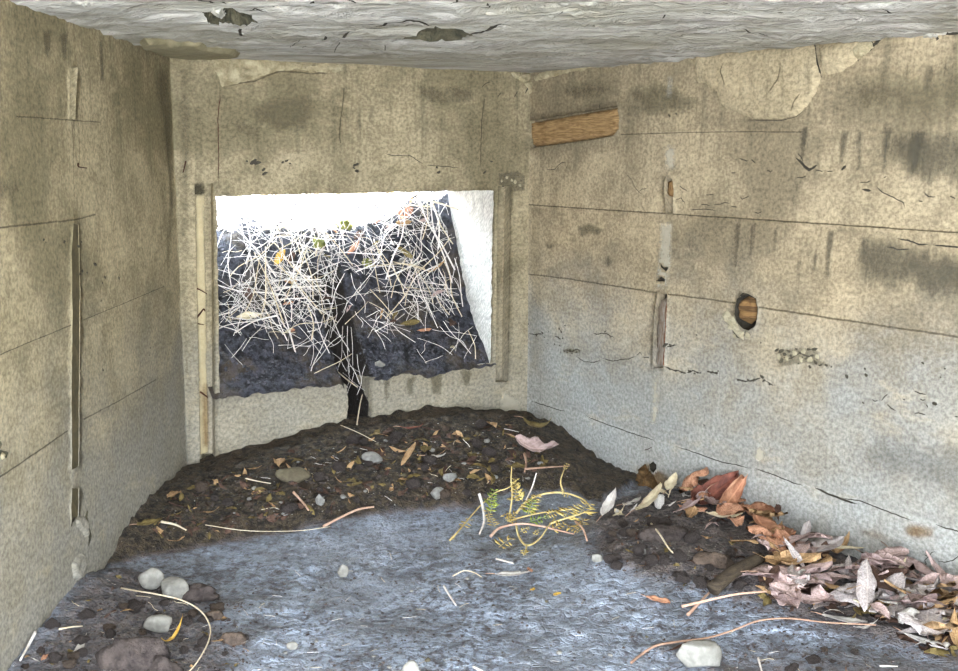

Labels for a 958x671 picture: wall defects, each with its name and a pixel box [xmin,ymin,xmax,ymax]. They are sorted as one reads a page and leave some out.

spalling [198,0,352,38]
spalling [366,11,513,46]
peeling [519,2,634,29]
damp [899,134,958,182]
damp [861,239,958,292]
flaking render [777,348,819,363]